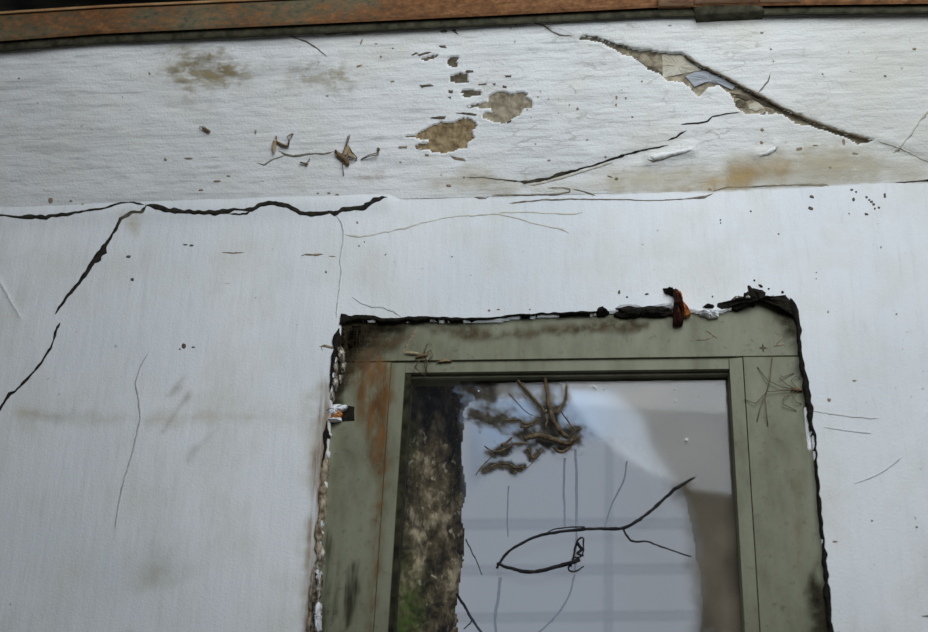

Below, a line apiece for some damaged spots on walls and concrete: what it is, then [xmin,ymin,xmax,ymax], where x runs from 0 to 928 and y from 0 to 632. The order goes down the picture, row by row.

water stain [175,51,242,82]
spalling [399,45,549,161]
crack [0,23,928,411]
rust [679,291,691,319]
crack [115,351,150,528]
rust [356,358,391,473]